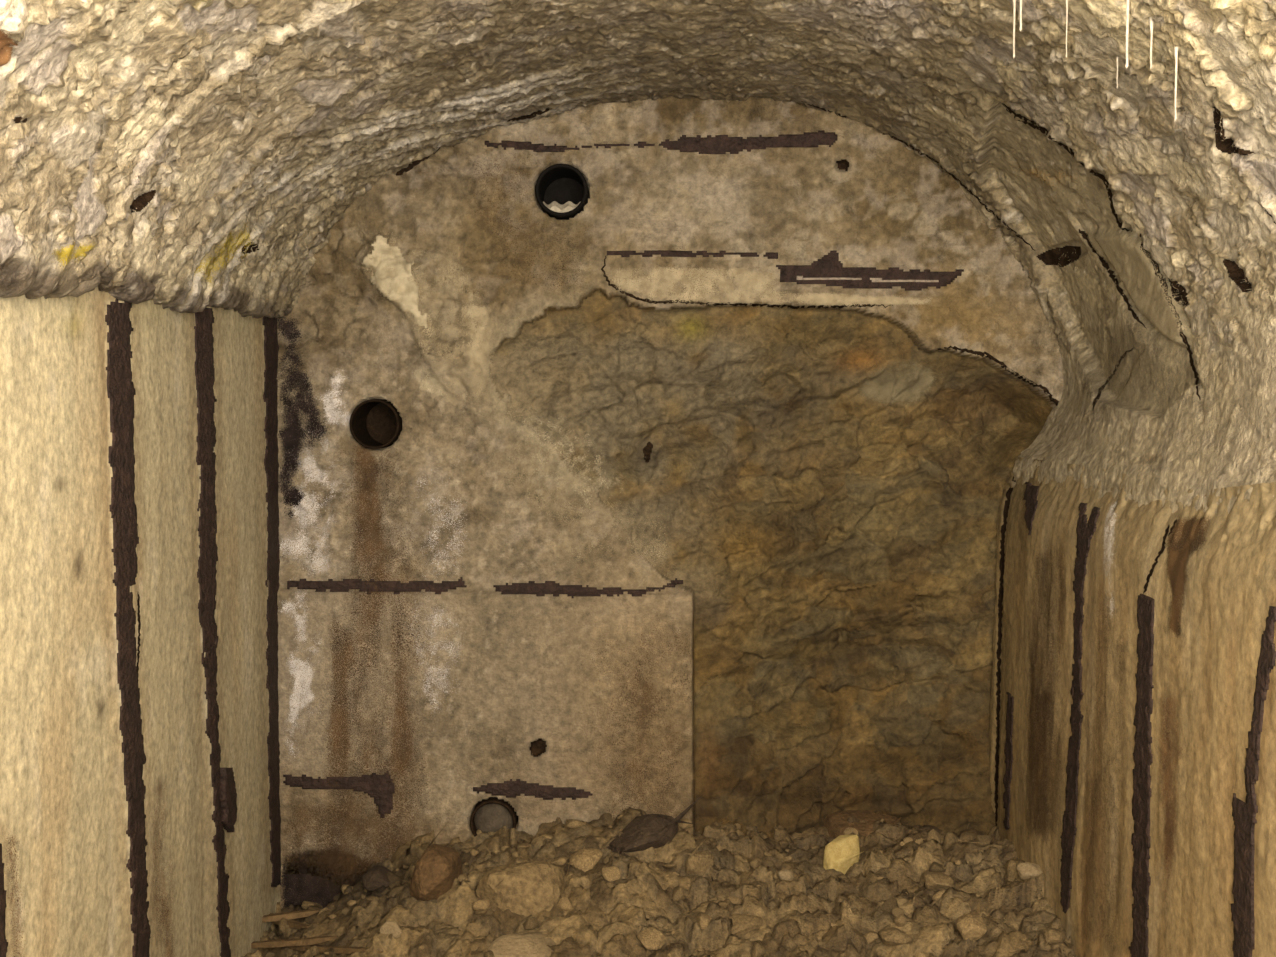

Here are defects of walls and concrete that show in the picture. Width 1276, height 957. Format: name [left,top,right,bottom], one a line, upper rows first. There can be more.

rust [0,30,19,67]
crack [601,256,893,309]
crack [1002,103,1201,409]
spalling [513,413,623,510]